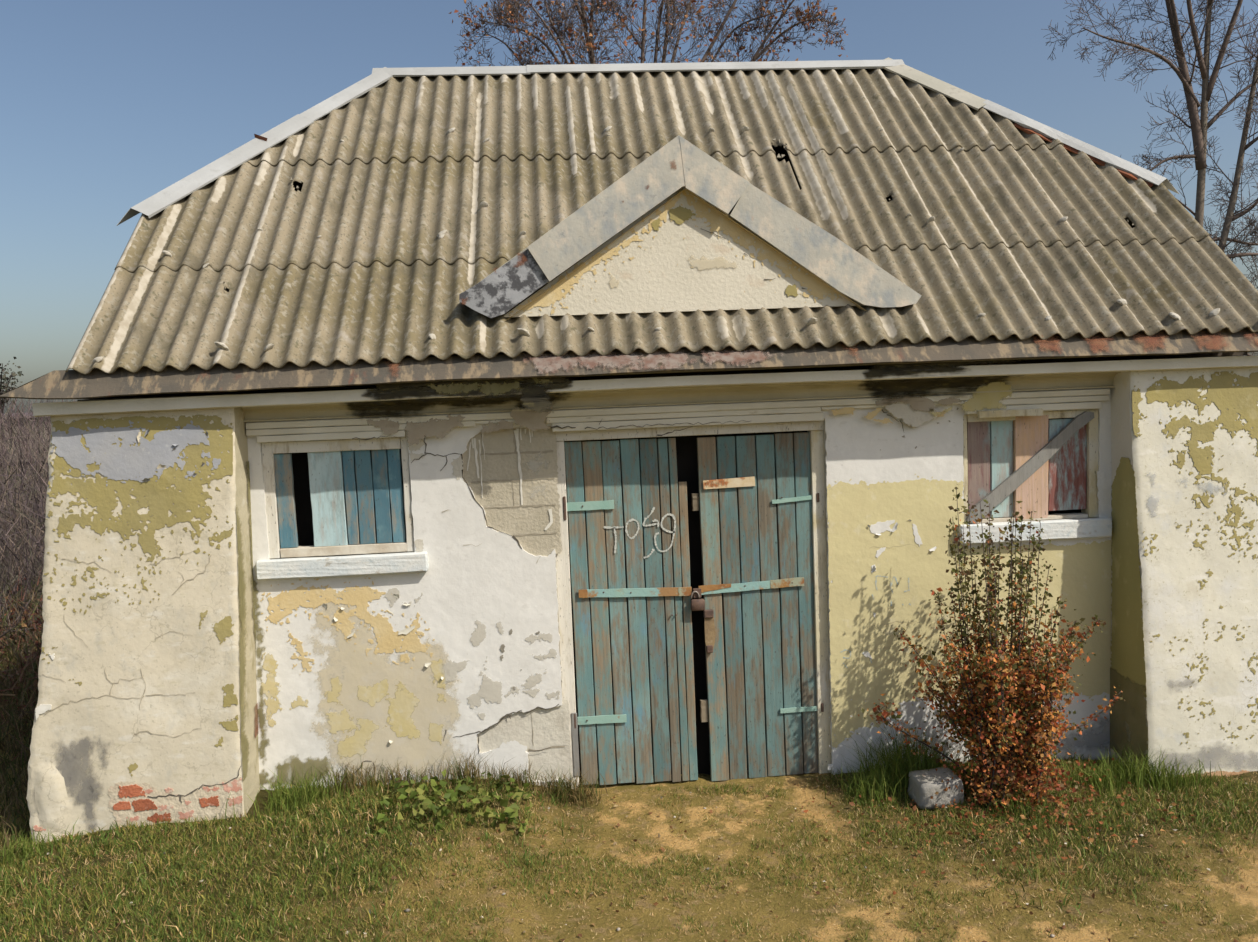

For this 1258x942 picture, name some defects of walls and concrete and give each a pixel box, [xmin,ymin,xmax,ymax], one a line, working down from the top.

peeling [509,188,841,316]
rust [1196,334,1226,350]
peeling [44,414,233,614]
crack [154,551,210,595]
crack [352,436,541,562]
peeling [963,457,1258,749]
peeling [1132,371,1258,562]
leakage [57,738,106,830]
crack [42,668,201,738]
flaking render [108,763,243,828]
crack [443,704,559,754]
flaking render [467,620,572,782]